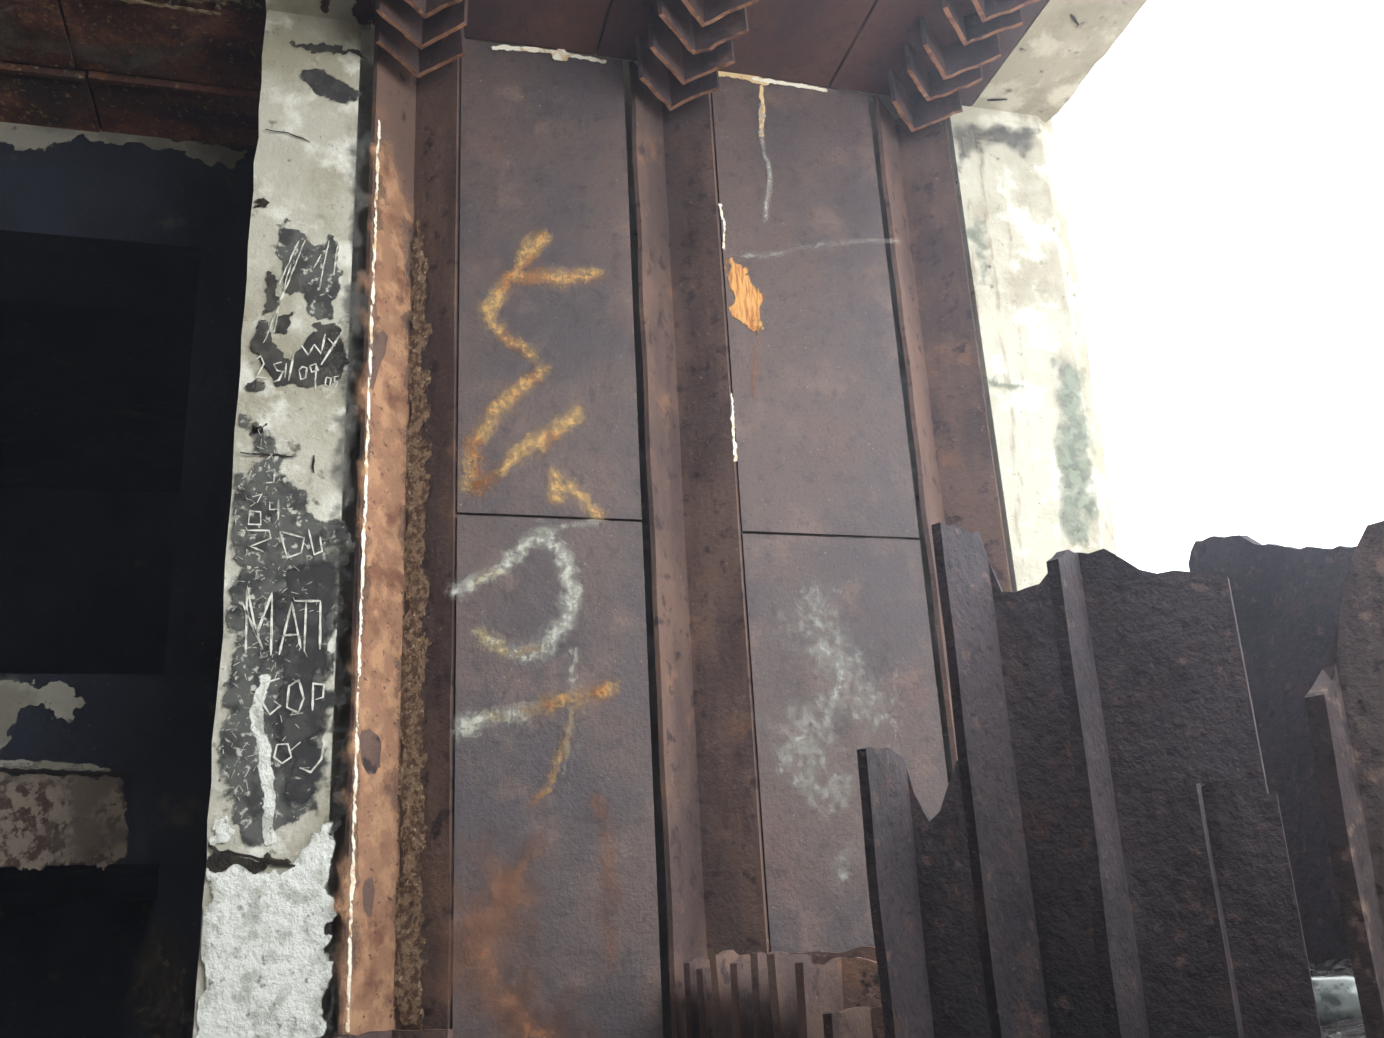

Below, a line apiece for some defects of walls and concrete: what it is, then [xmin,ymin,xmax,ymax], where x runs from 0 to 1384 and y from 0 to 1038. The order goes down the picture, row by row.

crack [320,0,330,13]
peeling [0,122,247,169]
rust [335,144,434,1035]
peeling [0,679,129,871]
flaking render [195,674,337,1038]